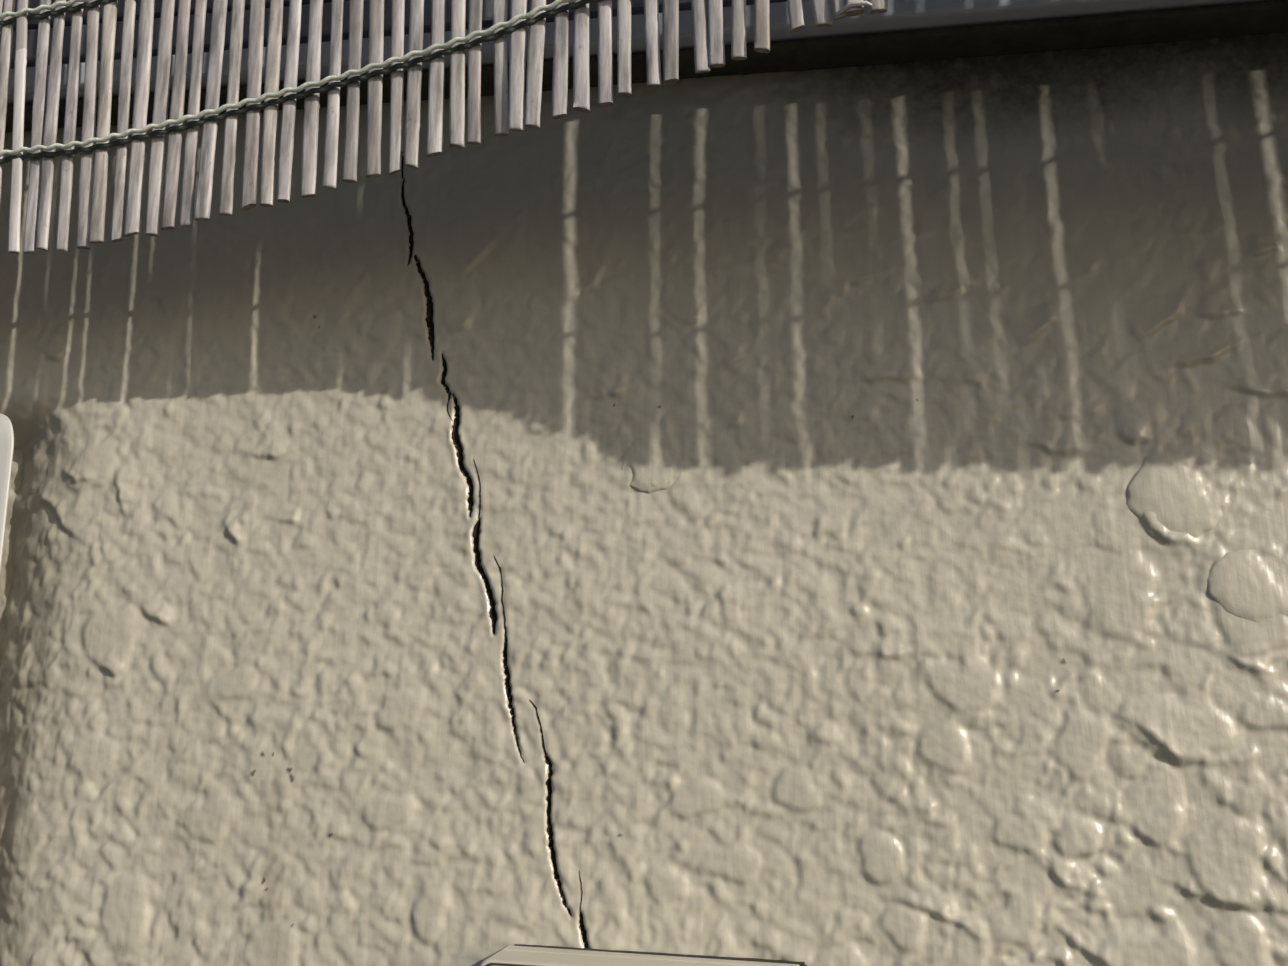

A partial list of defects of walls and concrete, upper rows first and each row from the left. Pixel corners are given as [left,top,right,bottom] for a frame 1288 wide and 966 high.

crack [401,151,589,948]